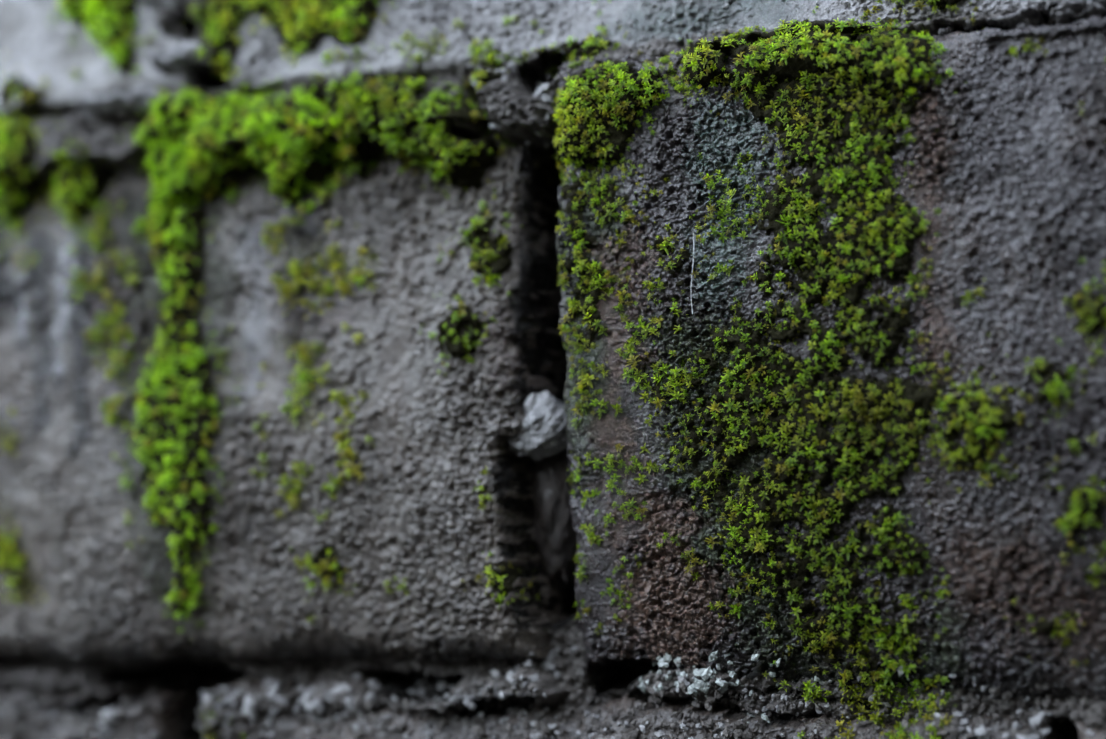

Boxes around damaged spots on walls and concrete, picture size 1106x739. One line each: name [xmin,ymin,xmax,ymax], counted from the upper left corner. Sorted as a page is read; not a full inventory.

damp [731,655,871,686]
damp [888,664,1106,700]